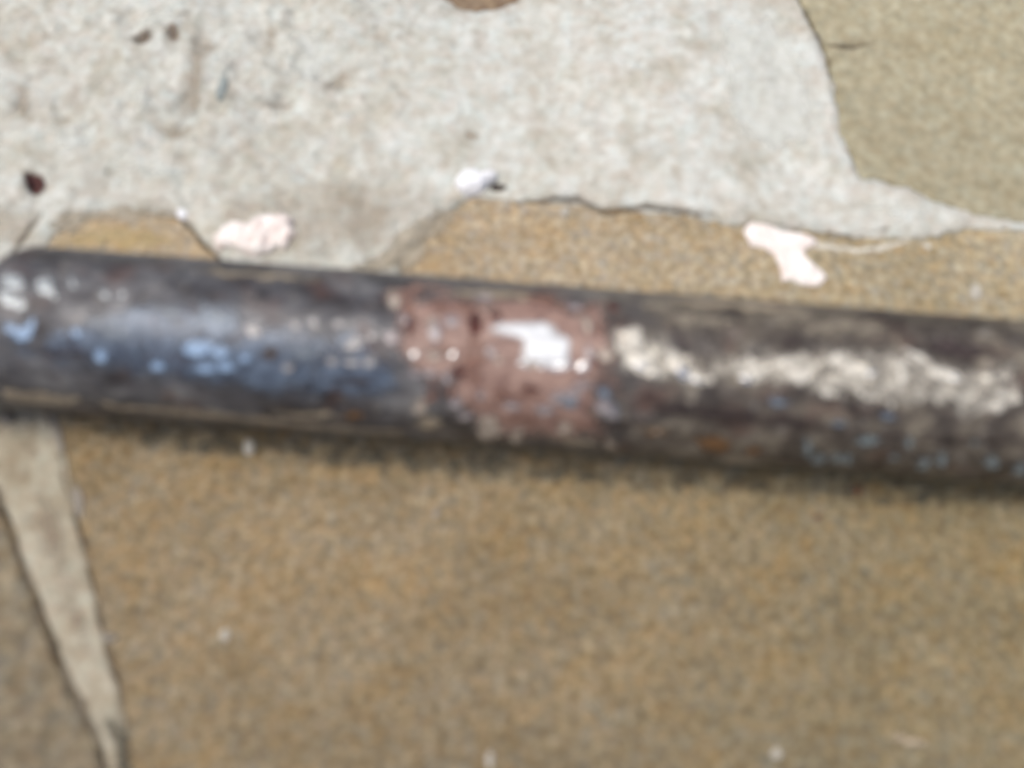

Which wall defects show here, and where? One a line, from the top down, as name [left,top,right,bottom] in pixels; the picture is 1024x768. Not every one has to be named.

corrosion [392,283,620,442]
peeling [243,439,255,455]